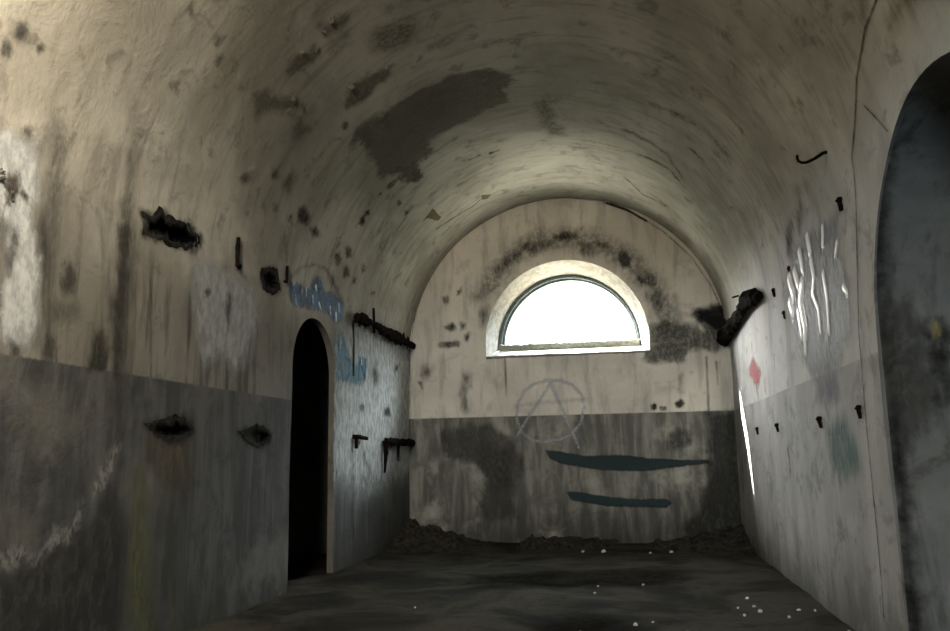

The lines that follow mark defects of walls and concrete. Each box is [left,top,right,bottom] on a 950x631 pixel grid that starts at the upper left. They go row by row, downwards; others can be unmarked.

peeling [343,65,513,195]
spalling [140,206,202,253]
water stain [618,251,630,267]